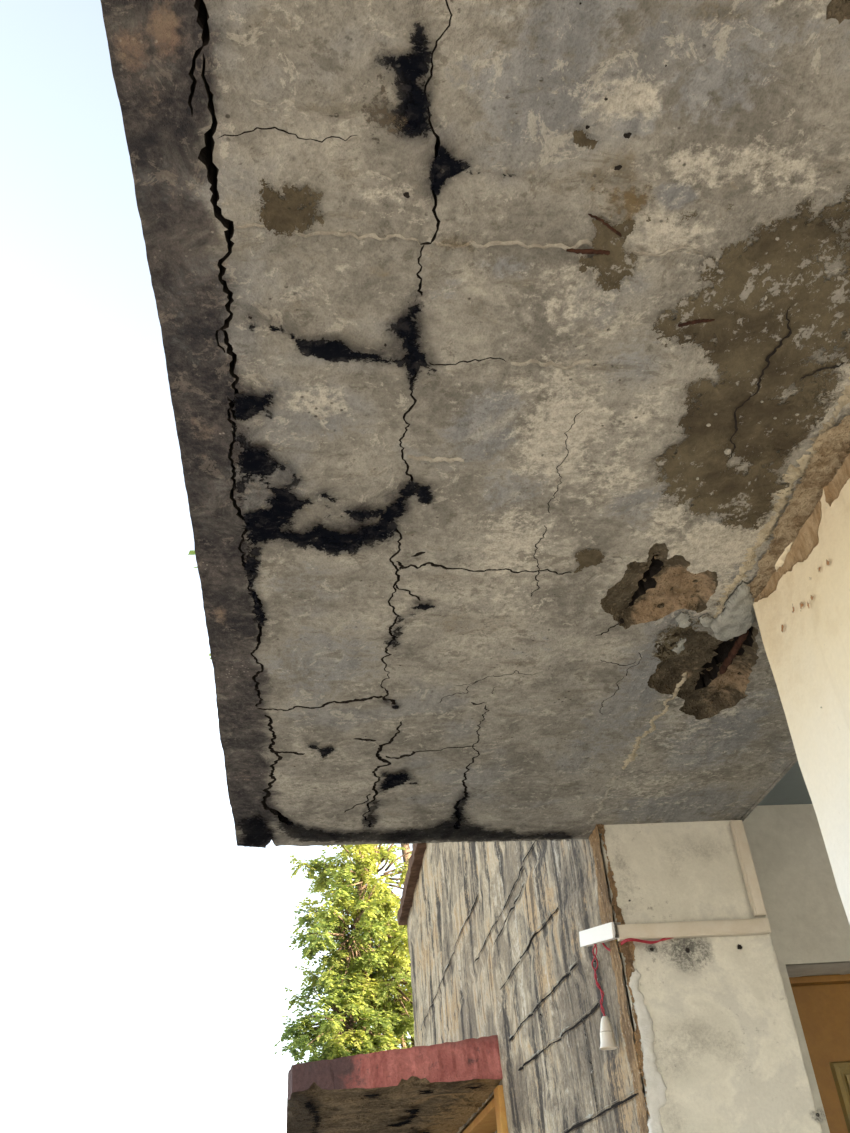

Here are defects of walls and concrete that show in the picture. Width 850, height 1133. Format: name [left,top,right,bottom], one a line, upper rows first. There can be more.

spalling [826,0,850,24]
water stain [361,23,433,143]
water stain [429,145,480,196]
peeling [566,208,701,292]
water stain [269,294,437,390]
crack [188,0,581,824]
peeling [651,183,850,602]
water stain [232,391,435,627]
spalling [574,543,759,720]